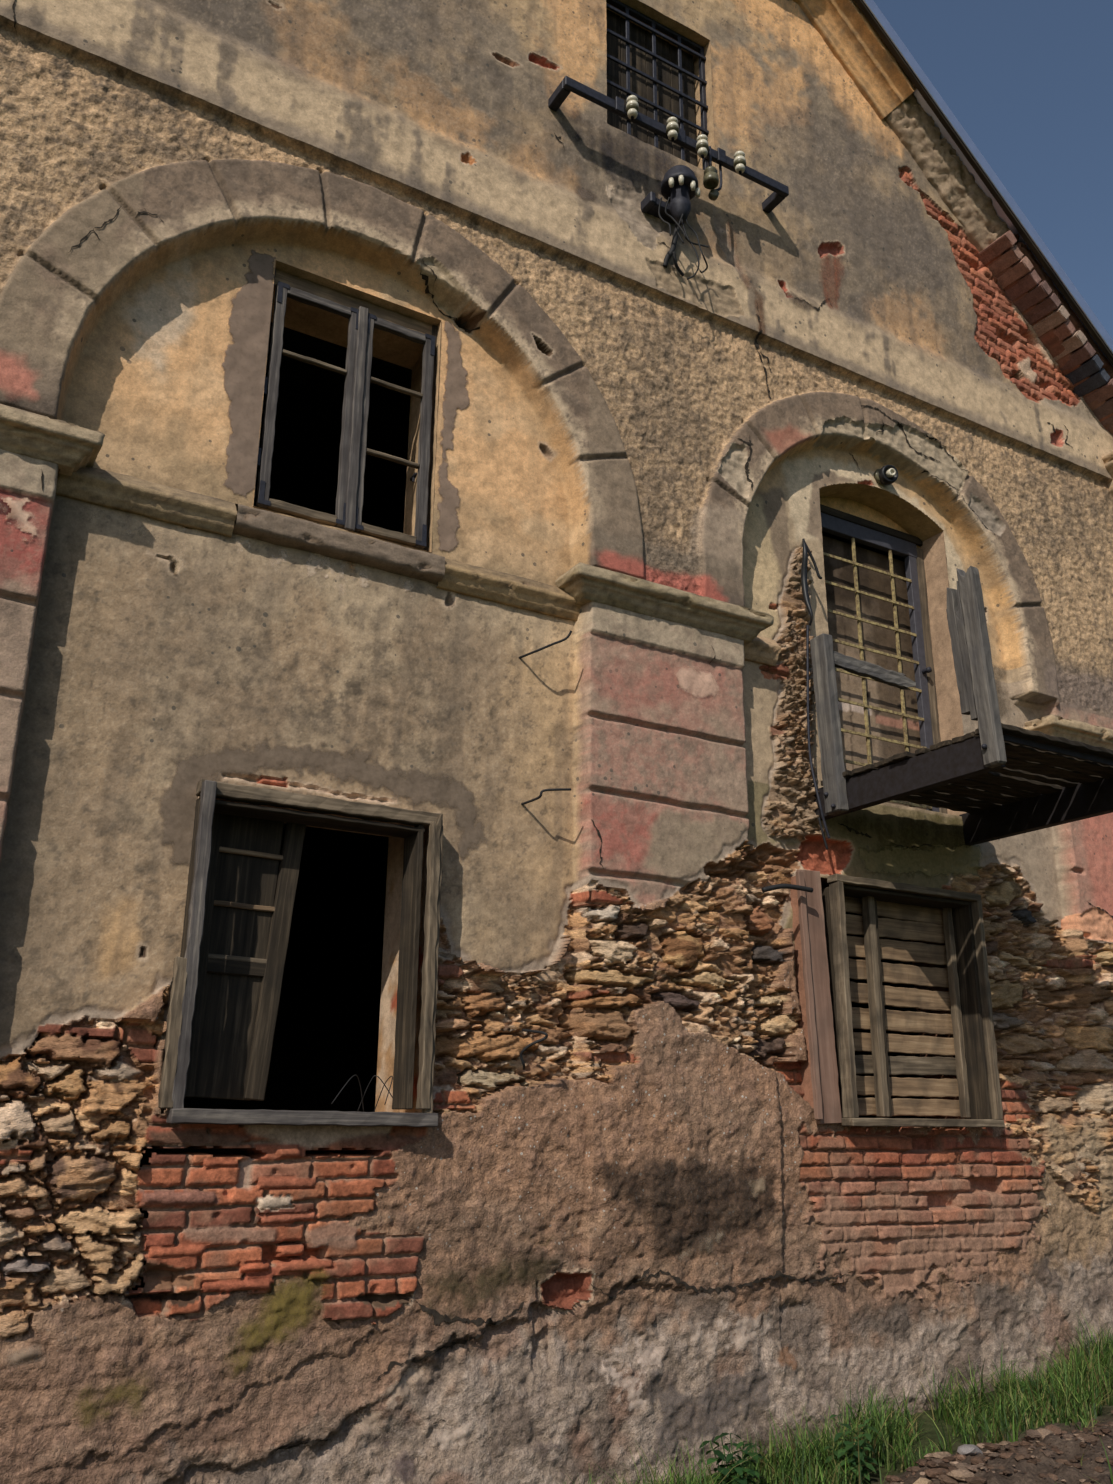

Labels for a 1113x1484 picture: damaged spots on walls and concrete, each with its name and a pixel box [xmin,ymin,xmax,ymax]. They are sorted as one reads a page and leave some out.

crack [68,207,163,253]
flaking render [818,241,845,258]
crack [795,297,832,311]
flaking render [898,165,1113,435]
crack [754,304,772,399]
flaking render [1050,428,1065,447]
crack [849,405,996,536]
peeling [1,497,36,535]
flaking render [0,547,1113,1337]
leakage [751,1178,764,1194]
crack [591,1267,849,1300]
crack [373,1300,526,1383]